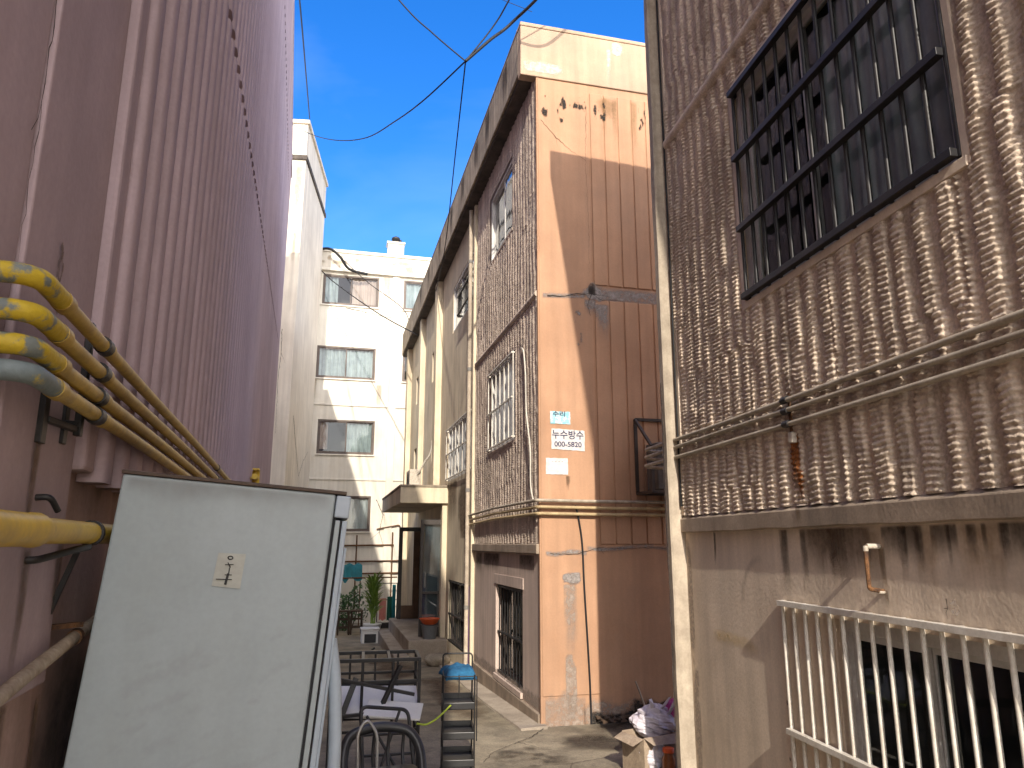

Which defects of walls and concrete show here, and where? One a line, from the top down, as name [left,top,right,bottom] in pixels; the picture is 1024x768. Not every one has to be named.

corrosion [790,434,805,494]
leakage [800,528,866,565]
leakage [881,524,985,552]
peeling [563,573,581,625]